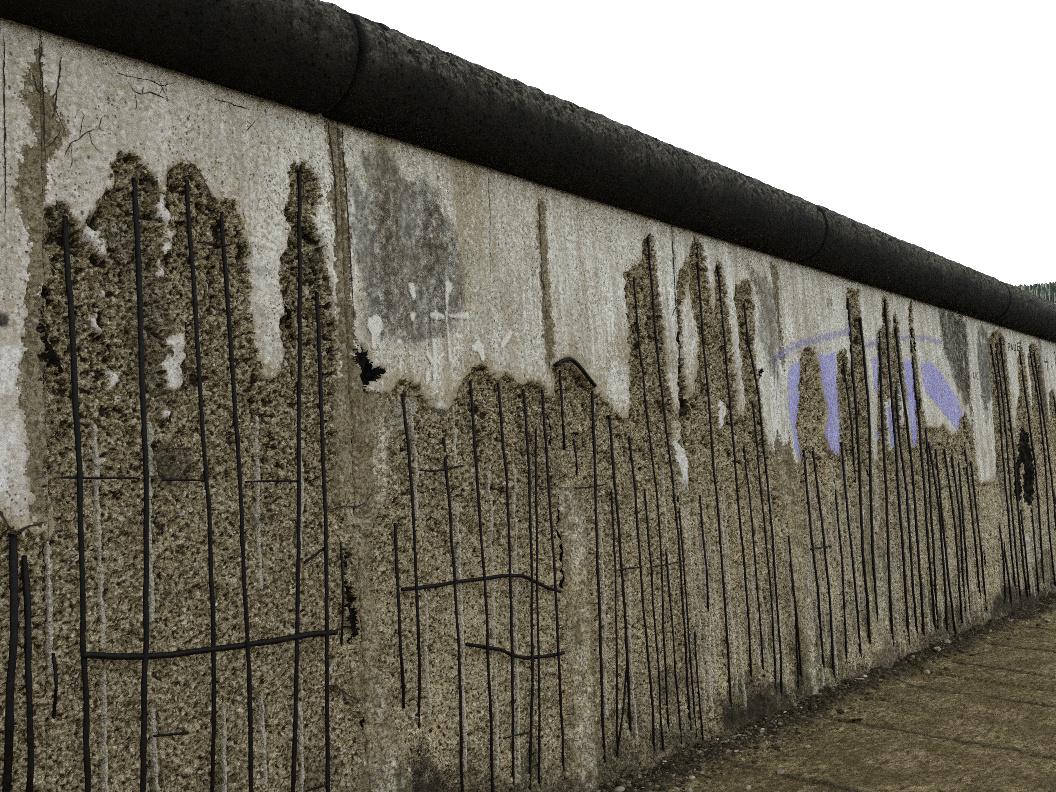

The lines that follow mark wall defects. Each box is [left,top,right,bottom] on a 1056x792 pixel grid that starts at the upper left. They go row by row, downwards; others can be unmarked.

spalling [0,44,787,792]
damp [354,156,463,339]
spalling [743,288,1056,708]